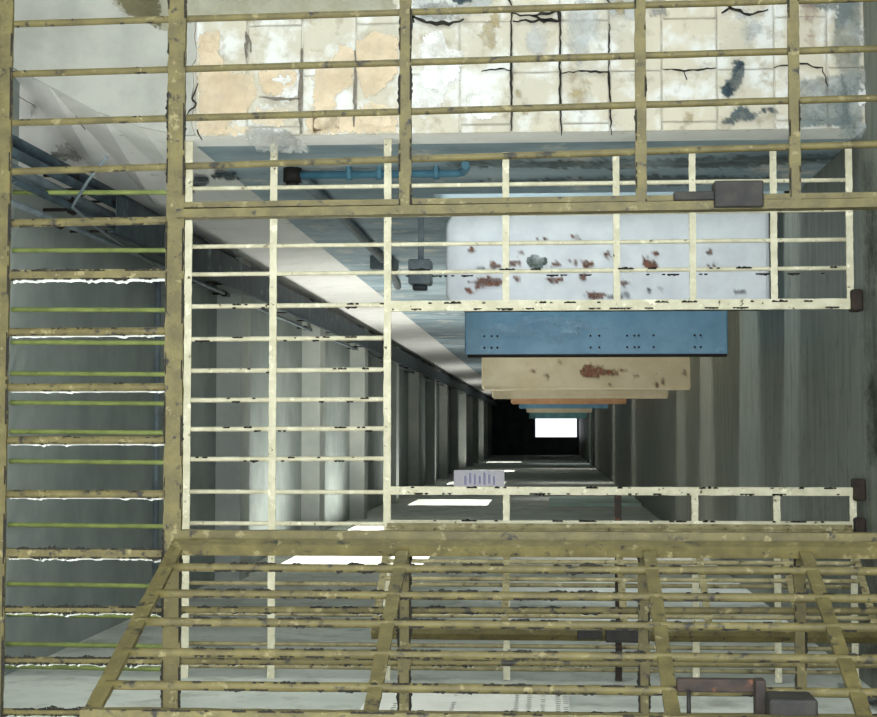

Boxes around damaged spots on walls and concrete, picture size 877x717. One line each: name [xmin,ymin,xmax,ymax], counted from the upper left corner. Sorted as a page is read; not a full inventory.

crack [412,15,464,26]
crack [721,6,768,16]
peeling [305,0,491,172]
crack [481,0,612,136]
damp [720,60,744,98]
peeling [182,31,307,195]
peeling [469,93,498,120]
damp [722,105,774,124]
corrosion [465,252,523,294]
corrosion [552,260,594,280]
corrosion [643,251,659,268]
peeling [0,636,111,717]